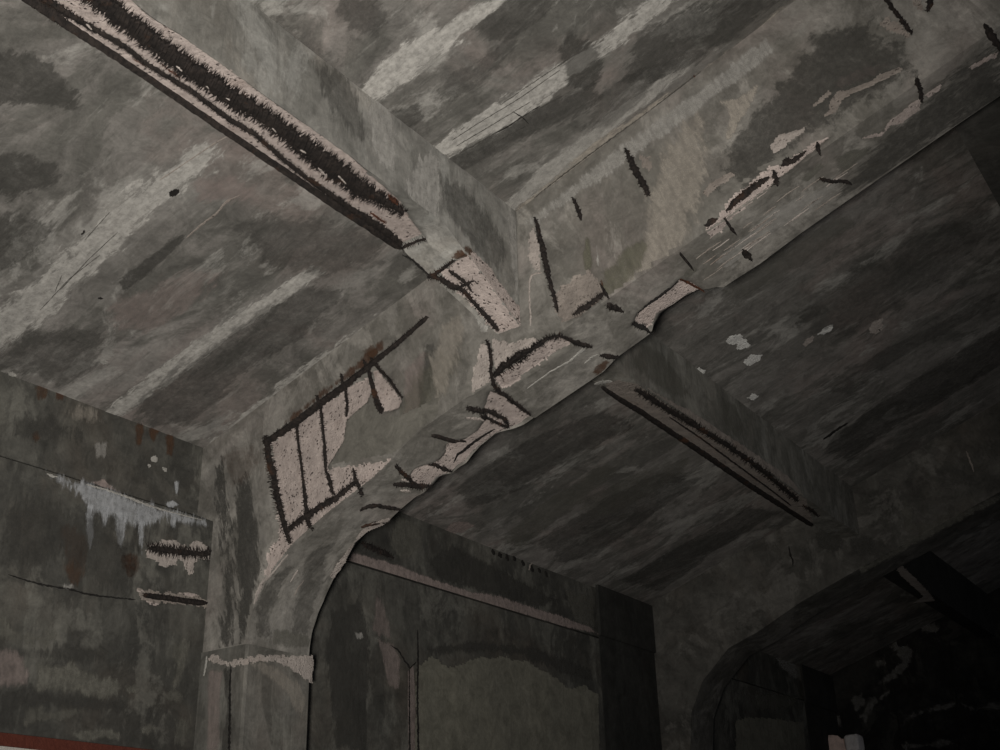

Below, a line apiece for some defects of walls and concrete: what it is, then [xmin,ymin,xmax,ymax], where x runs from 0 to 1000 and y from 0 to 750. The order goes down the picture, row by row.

spalling [22,0,427,253]
spalling [702,127,829,239]
spalling [819,177,852,185]
spalling [631,252,705,336]
spalling [254,217,624,604]
spalling [594,379,820,527]
crack [8,574,136,600]
leakage [9,473,206,581]
spalling [137,588,208,609]
spalling [145,539,212,575]
spalling [203,654,314,683]